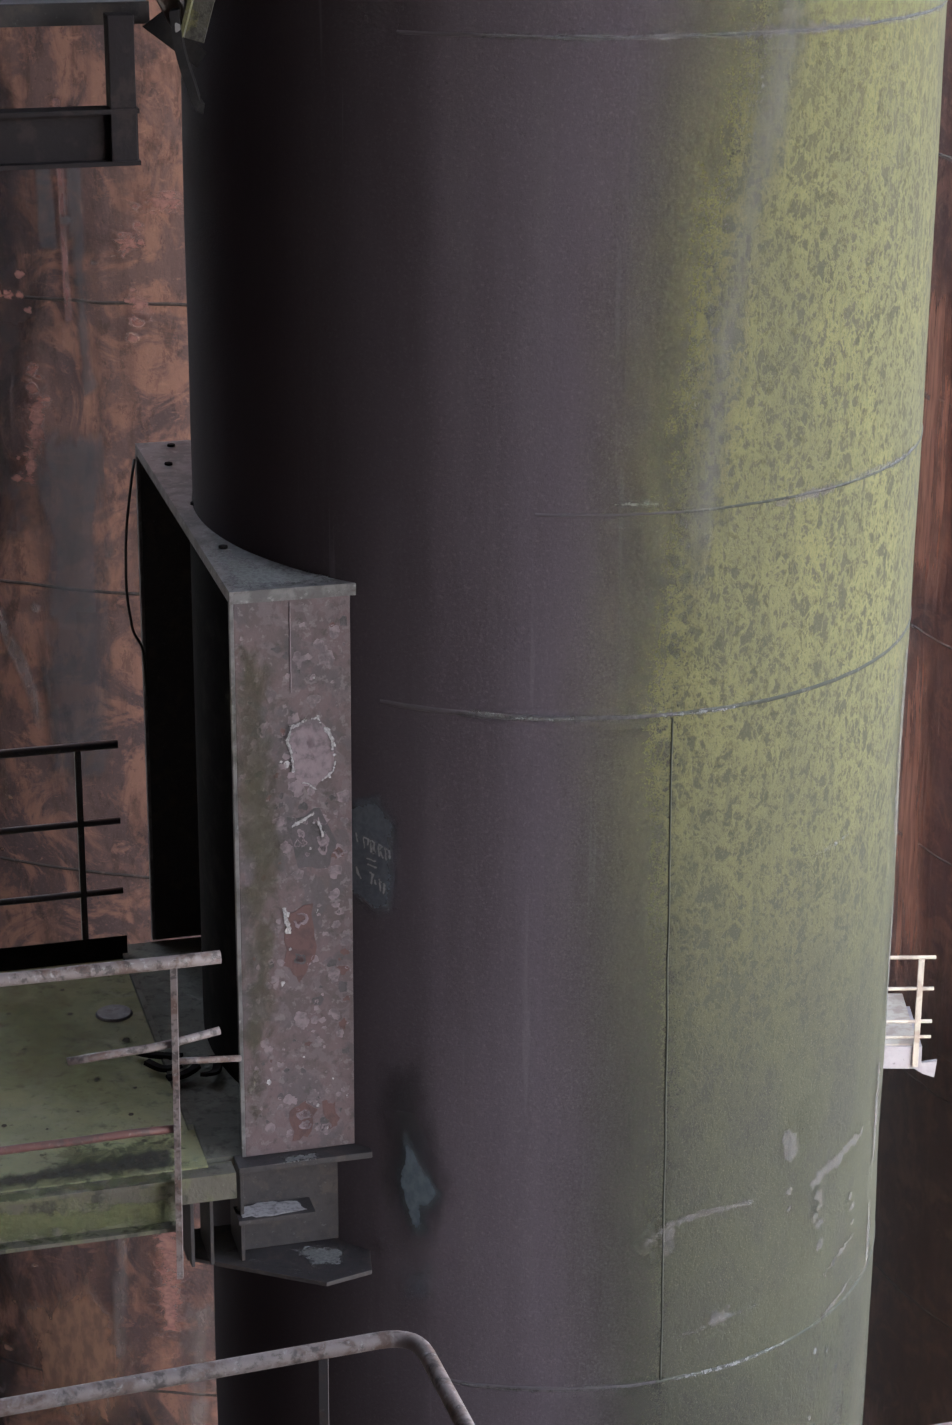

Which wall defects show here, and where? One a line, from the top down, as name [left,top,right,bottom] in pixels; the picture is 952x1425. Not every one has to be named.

rust [0,270,32,314]
rust [11,363,51,485]
rust [57,168,71,321]
rust [914,287,952,593]
peeling [238,616,353,1141]
rust [895,653,928,964]